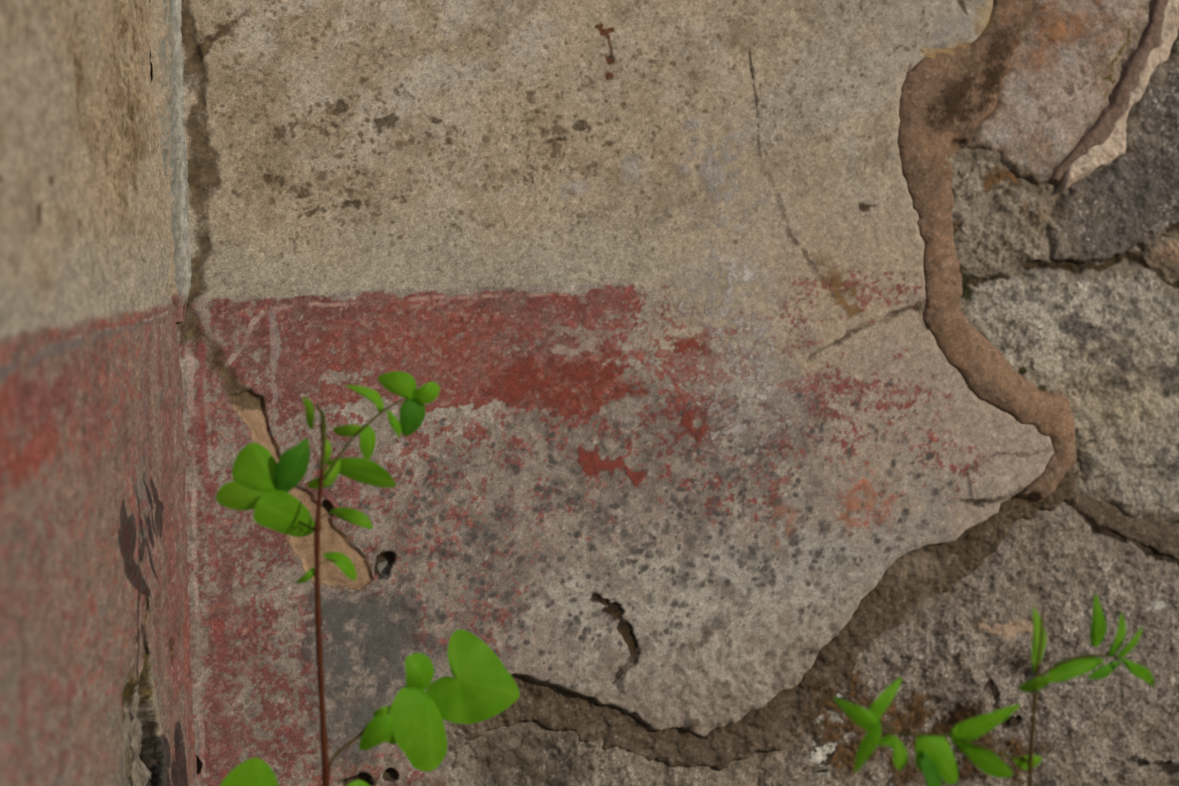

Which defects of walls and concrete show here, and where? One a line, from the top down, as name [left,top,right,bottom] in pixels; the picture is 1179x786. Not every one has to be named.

rust [596,24,615,80]
crack [749,51,759,128]
crack [177,0,264,410]
peeling [490,350,647,415]
spalling [231,387,281,463]
peeling [676,406,709,441]
peeling [578,447,645,486]
spalling [287,487,372,590]
crack [1071,501,1179,567]
crack [590,593,639,684]
crack [137,597,161,786]
spalling [123,681,160,786]